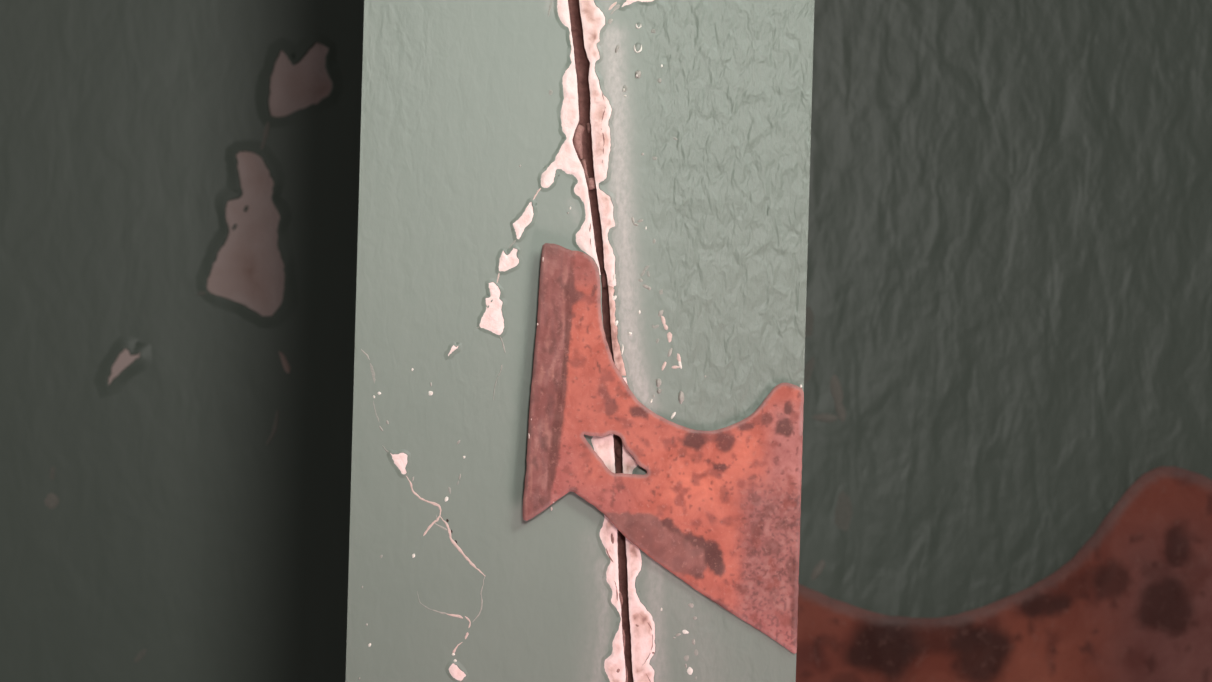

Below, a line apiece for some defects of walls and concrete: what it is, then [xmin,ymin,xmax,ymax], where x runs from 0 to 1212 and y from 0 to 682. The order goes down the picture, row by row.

peeling [476,0,658,400]
crack [568,0,615,364]
peeling [588,434,640,474]
crack [613,434,623,473]
crack [617,529,634,682]
peeling [596,511,698,682]